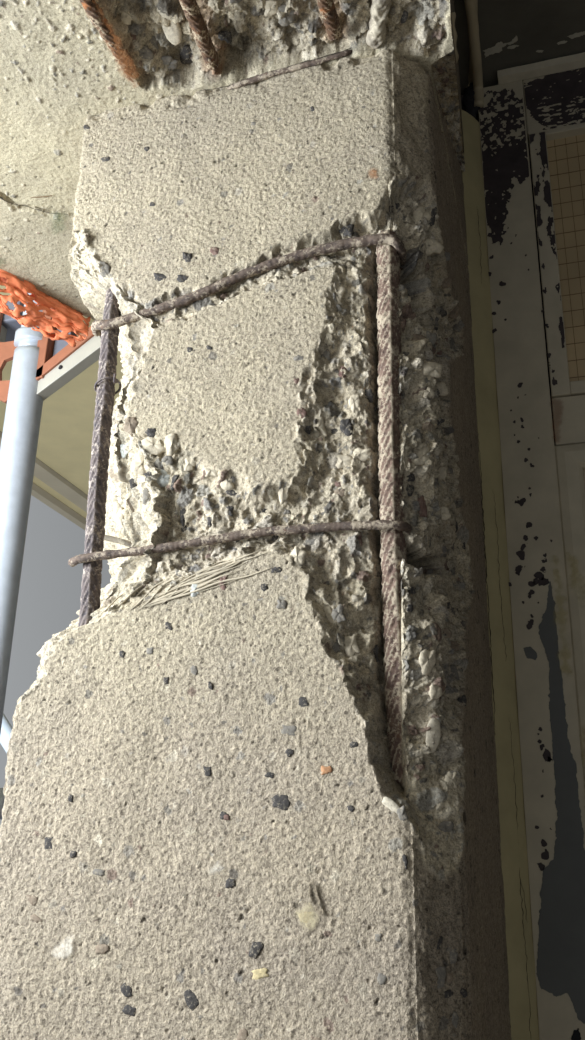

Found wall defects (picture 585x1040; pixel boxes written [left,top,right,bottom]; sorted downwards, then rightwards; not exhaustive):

peeling [483,36,519,58]
spalling [94,0,466,179]
peeling [479,67,585,259]
crack [0,195,68,215]
peeling [541,309,565,386]
spalling [17,172,475,884]
peeling [508,522,553,630]
peeling [537,727,553,772]
peeling [535,825,552,871]